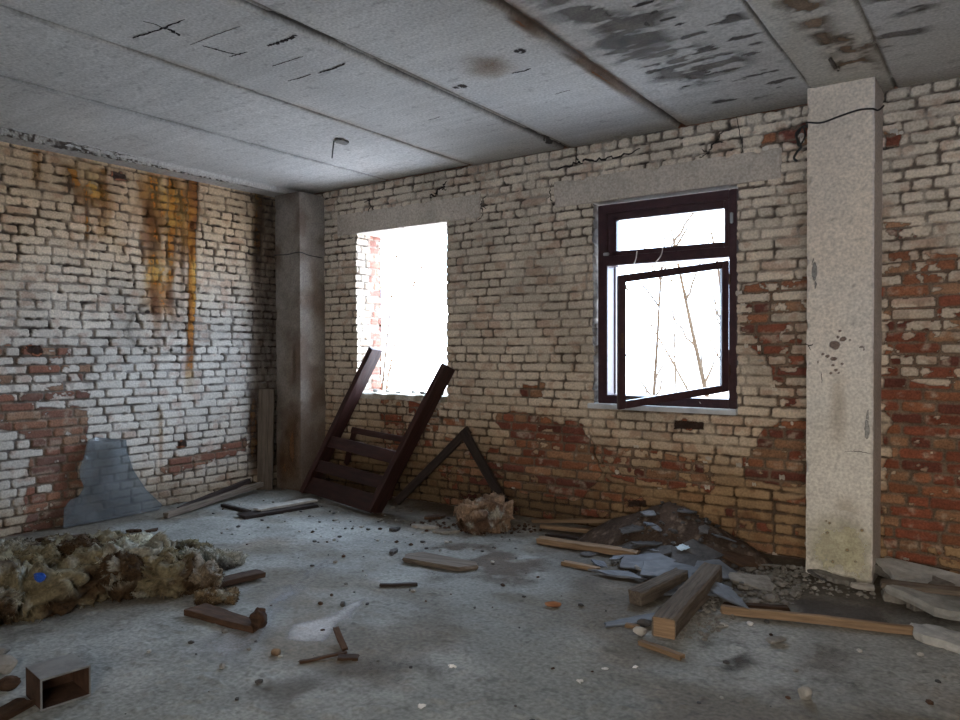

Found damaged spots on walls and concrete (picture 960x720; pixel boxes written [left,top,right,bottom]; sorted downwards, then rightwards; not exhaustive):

water stain [546,0,795,88]
rust [65,166,106,238]
crack [546,148,640,206]
crack [699,117,743,158]
rust [140,175,199,370]
peeling [0,344,93,533]
peeling [380,399,420,450]
peeling [518,382,545,399]
peeling [395,405,716,534]
peeling [736,420,807,505]
peeling [881,222,960,573]